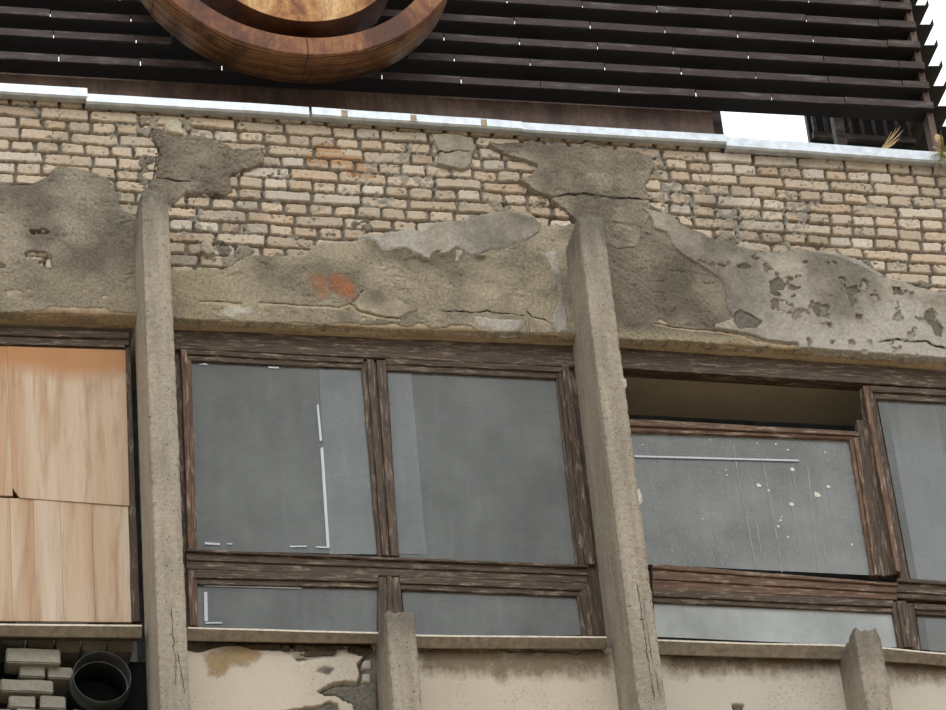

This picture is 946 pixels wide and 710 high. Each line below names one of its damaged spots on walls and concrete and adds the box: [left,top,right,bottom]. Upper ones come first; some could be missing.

crack [534,192,652,235]
peeling [171,134,946,367]
crack [448,310,557,338]
crack [883,338,945,349]
spalling [187,641,379,710]